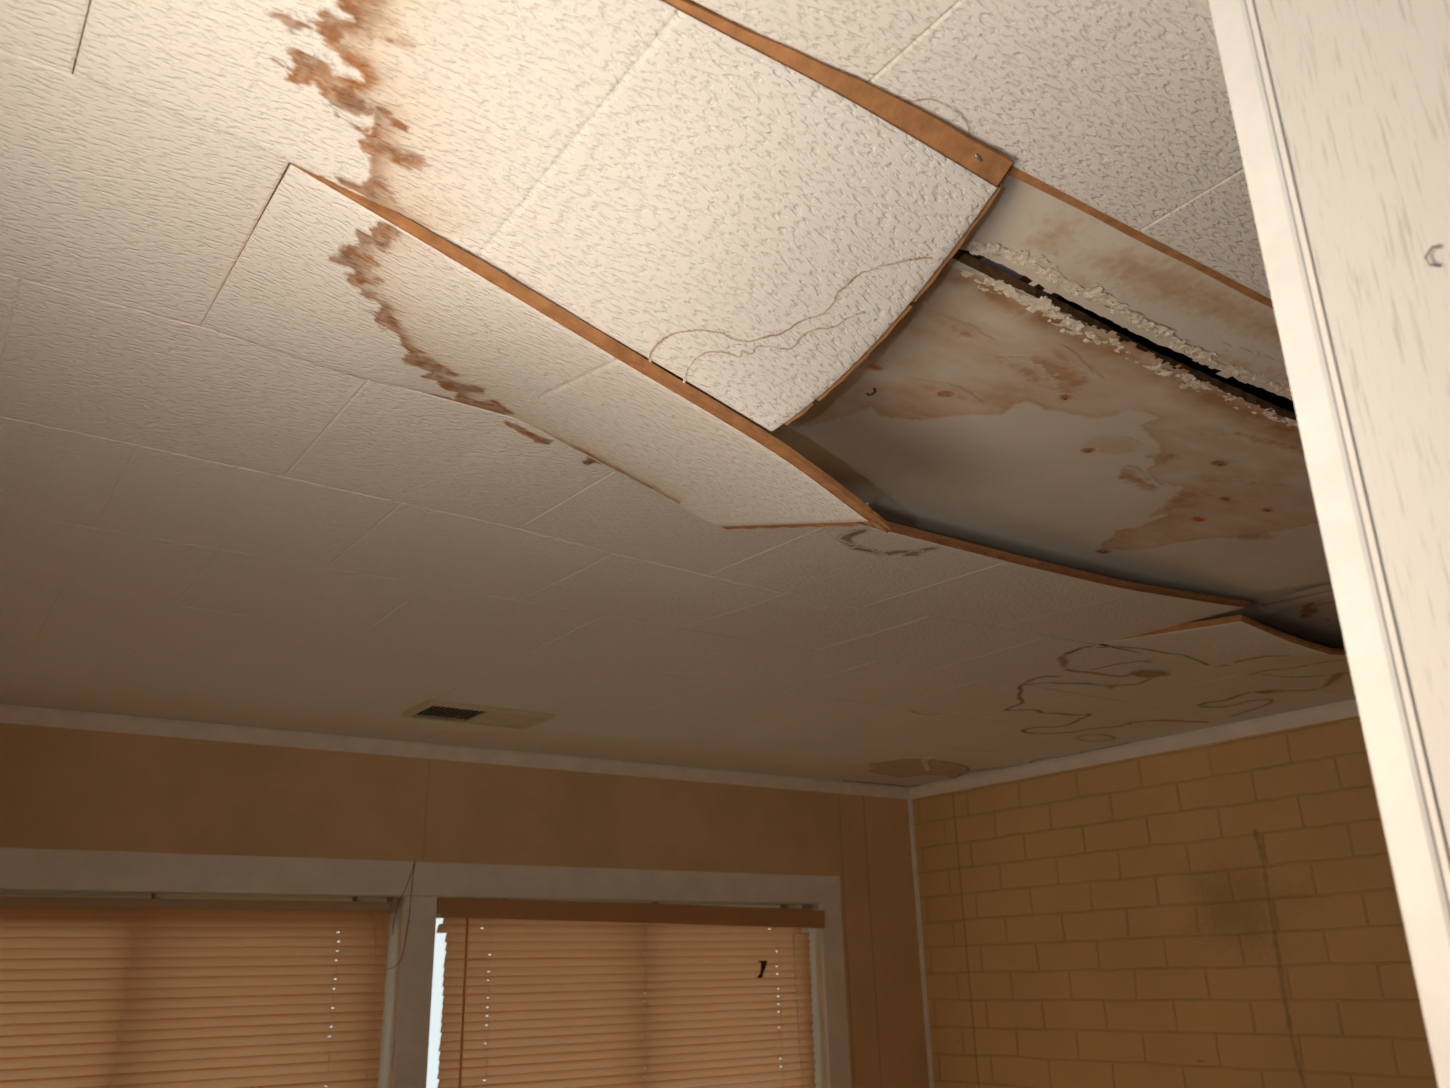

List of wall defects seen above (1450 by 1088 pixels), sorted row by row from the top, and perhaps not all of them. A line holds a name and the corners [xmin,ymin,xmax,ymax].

leakage [260,0,700,504]
leakage [649,209,1319,551]
peeling [961,240,1299,427]
leakage [834,527,941,557]
leakage [865,645,1351,778]
crack [1252,828,1308,1088]